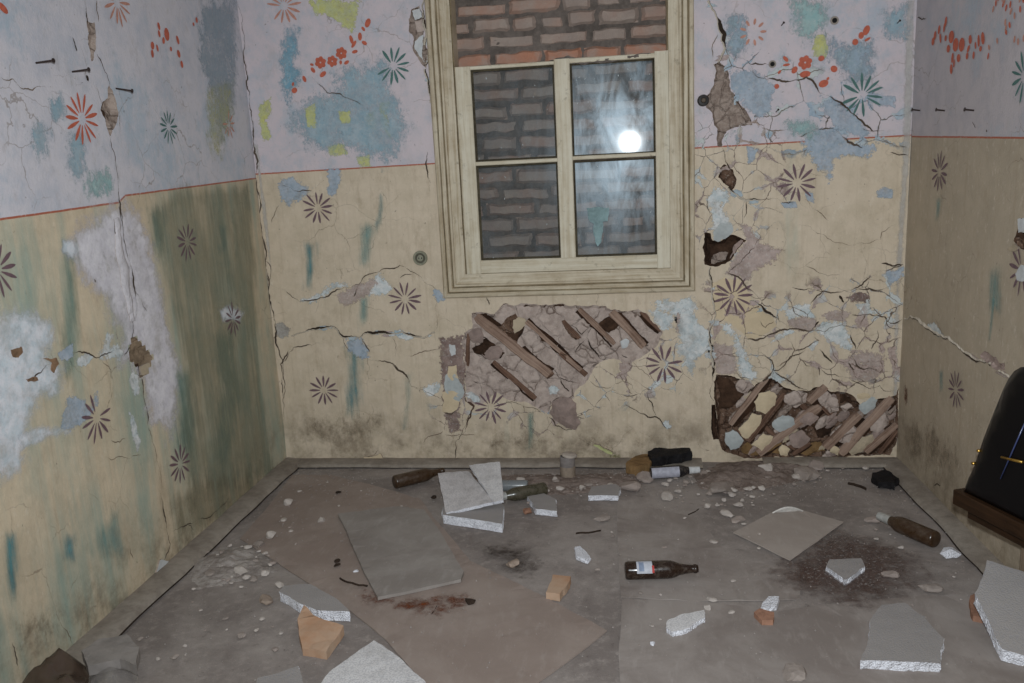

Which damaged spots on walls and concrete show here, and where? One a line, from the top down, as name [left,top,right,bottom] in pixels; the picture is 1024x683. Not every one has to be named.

spalling [101,86,119,136]
spalling [706,14,775,147]
crack [239,0,1010,458]
peeling [703,164,782,281]
peeling [0,312,153,478]
spalling [422,292,899,470]